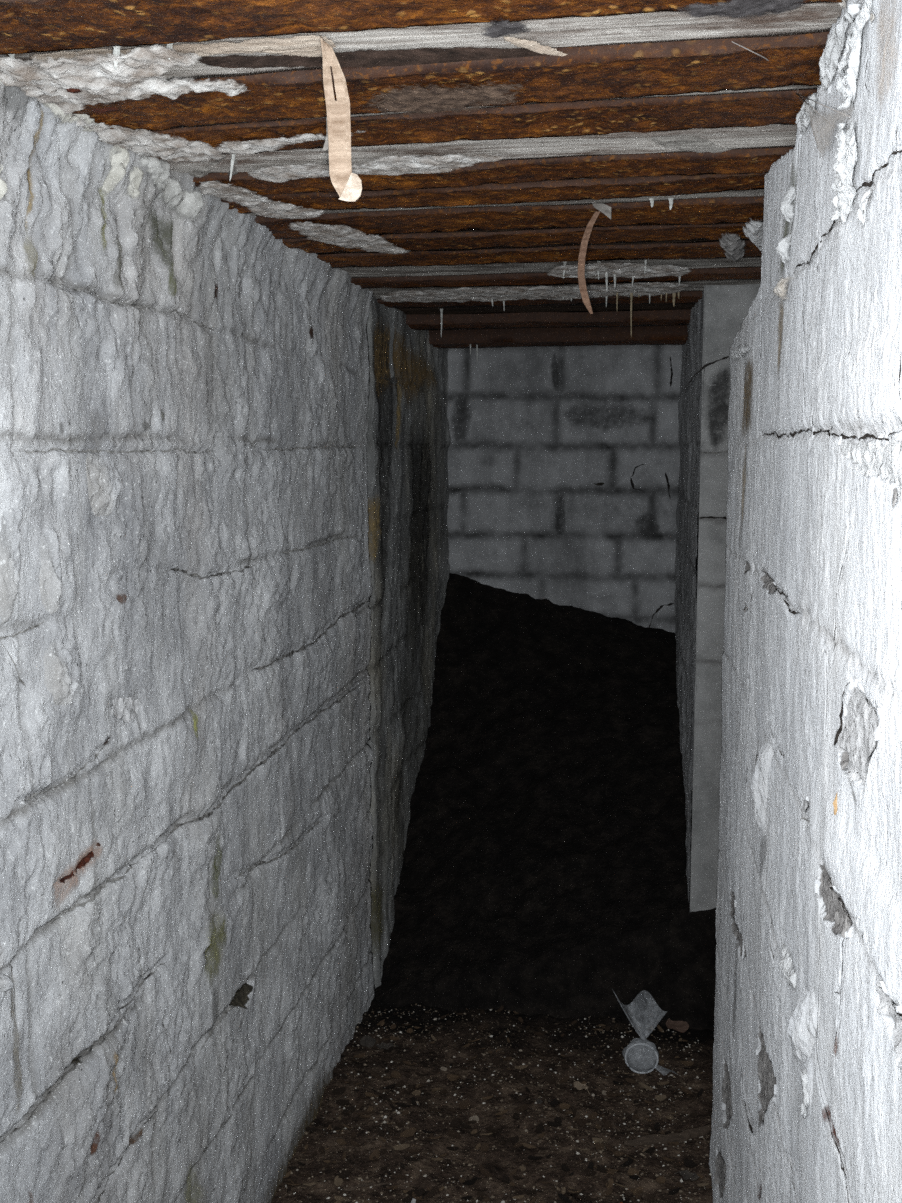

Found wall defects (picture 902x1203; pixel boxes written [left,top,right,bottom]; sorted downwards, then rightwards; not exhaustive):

peeling [30,47,149,63]
peeling [165,35,336,57]
crack [856,150,902,206]
crack [788,145,835,325]
water stain [709,361,753,444]
crack [762,374,901,441]
crack [761,570,799,614]
crack [251,600,370,671]
spalling [834,679,884,806]
flaking render [815,864,853,938]
spalling [228,983,253,1009]
spalling [756,1027,777,1125]